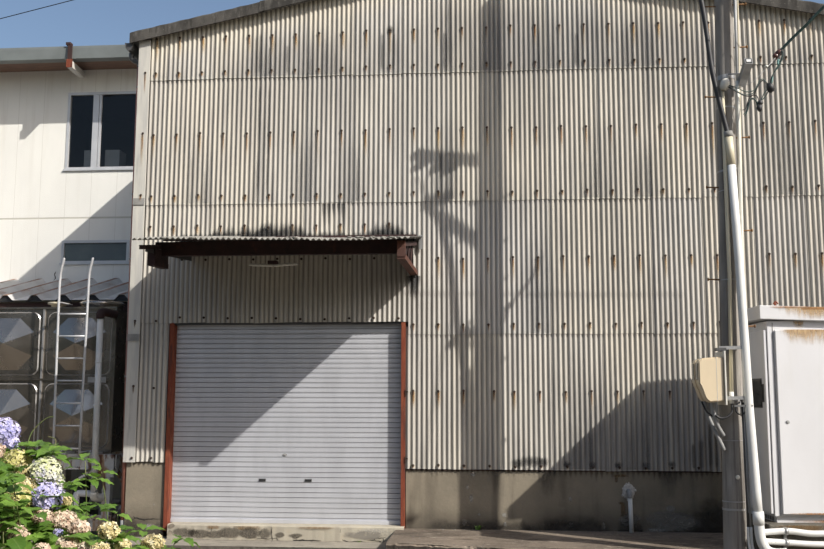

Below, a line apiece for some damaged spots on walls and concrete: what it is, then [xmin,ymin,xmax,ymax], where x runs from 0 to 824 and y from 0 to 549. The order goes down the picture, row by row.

leakage [322,203,344,222]
leakage [176,227,343,242]
leakage [354,227,416,242]
corrosion [776,306,824,338]
leakage [433,521,607,531]